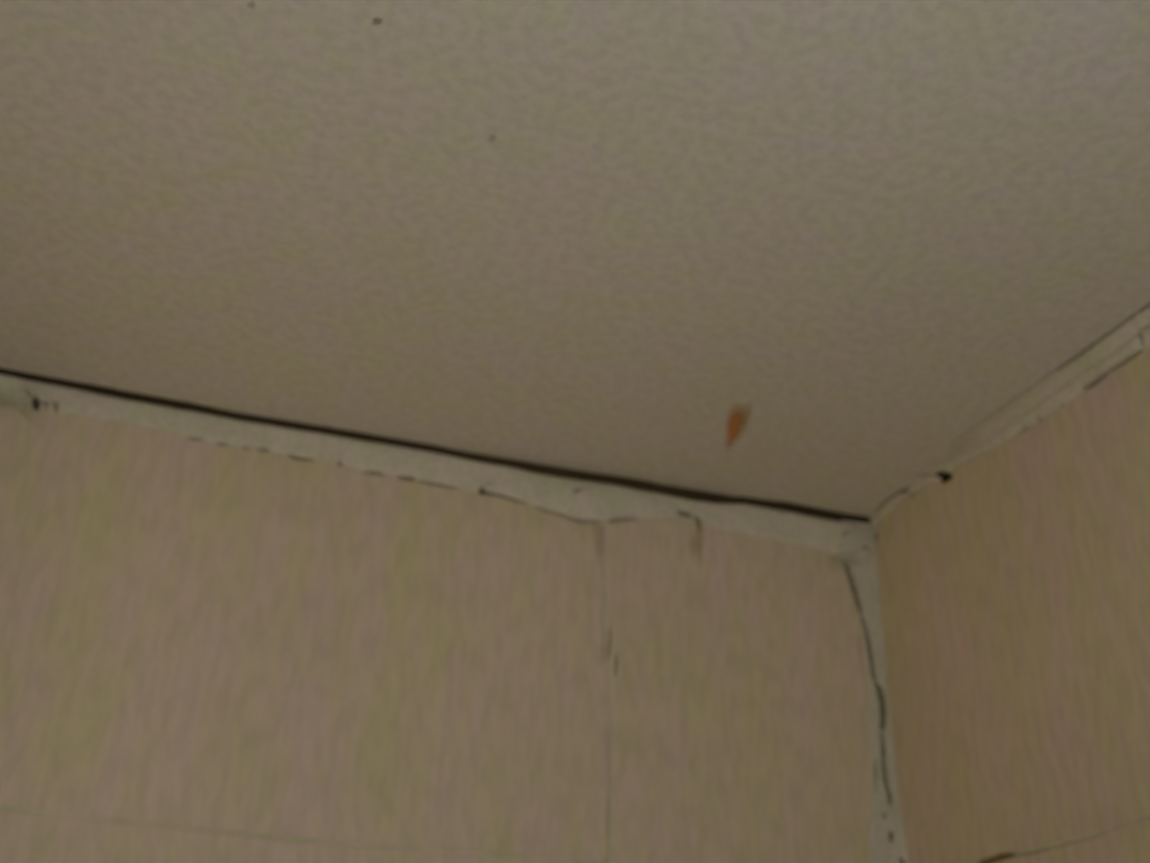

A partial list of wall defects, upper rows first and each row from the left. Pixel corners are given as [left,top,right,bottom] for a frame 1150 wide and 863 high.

crack [0,368,870,525]